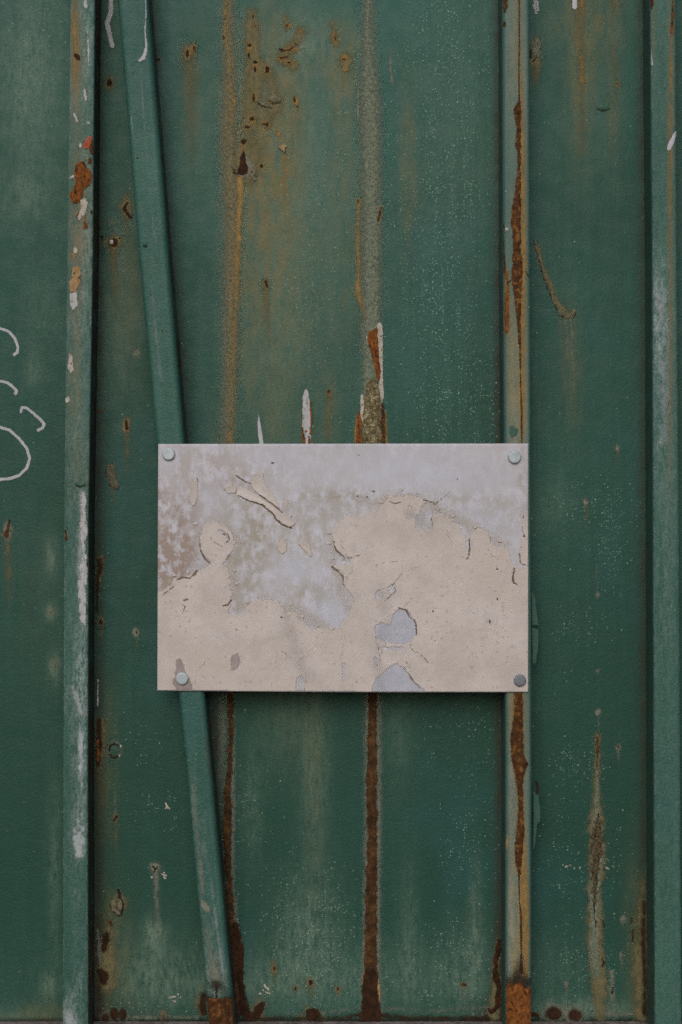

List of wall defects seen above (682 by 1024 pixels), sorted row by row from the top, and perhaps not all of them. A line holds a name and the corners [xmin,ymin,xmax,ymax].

rust [69,157,92,228]
rust [222,0,304,444]
rust [503,0,541,444]
peeling [224,473,296,529]
peeling [158,491,538,692]
peeling [354,323,388,444]
rust [196,691,274,1024]
rust [344,692,583,1024]
rust [587,733,647,1021]